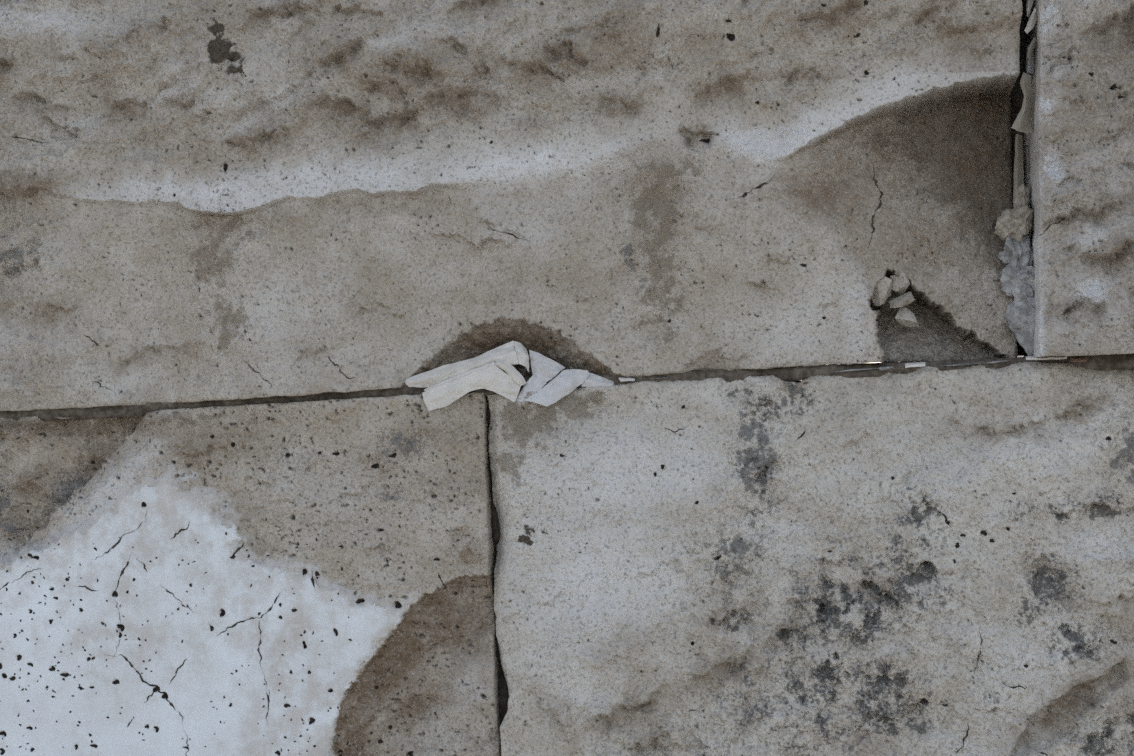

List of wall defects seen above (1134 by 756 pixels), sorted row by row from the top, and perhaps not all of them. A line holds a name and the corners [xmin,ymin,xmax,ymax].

crack [869,165,883,245]
spalling [756,78,1018,372]
crack [78,511,189,756]
crack [166,590,281,722]